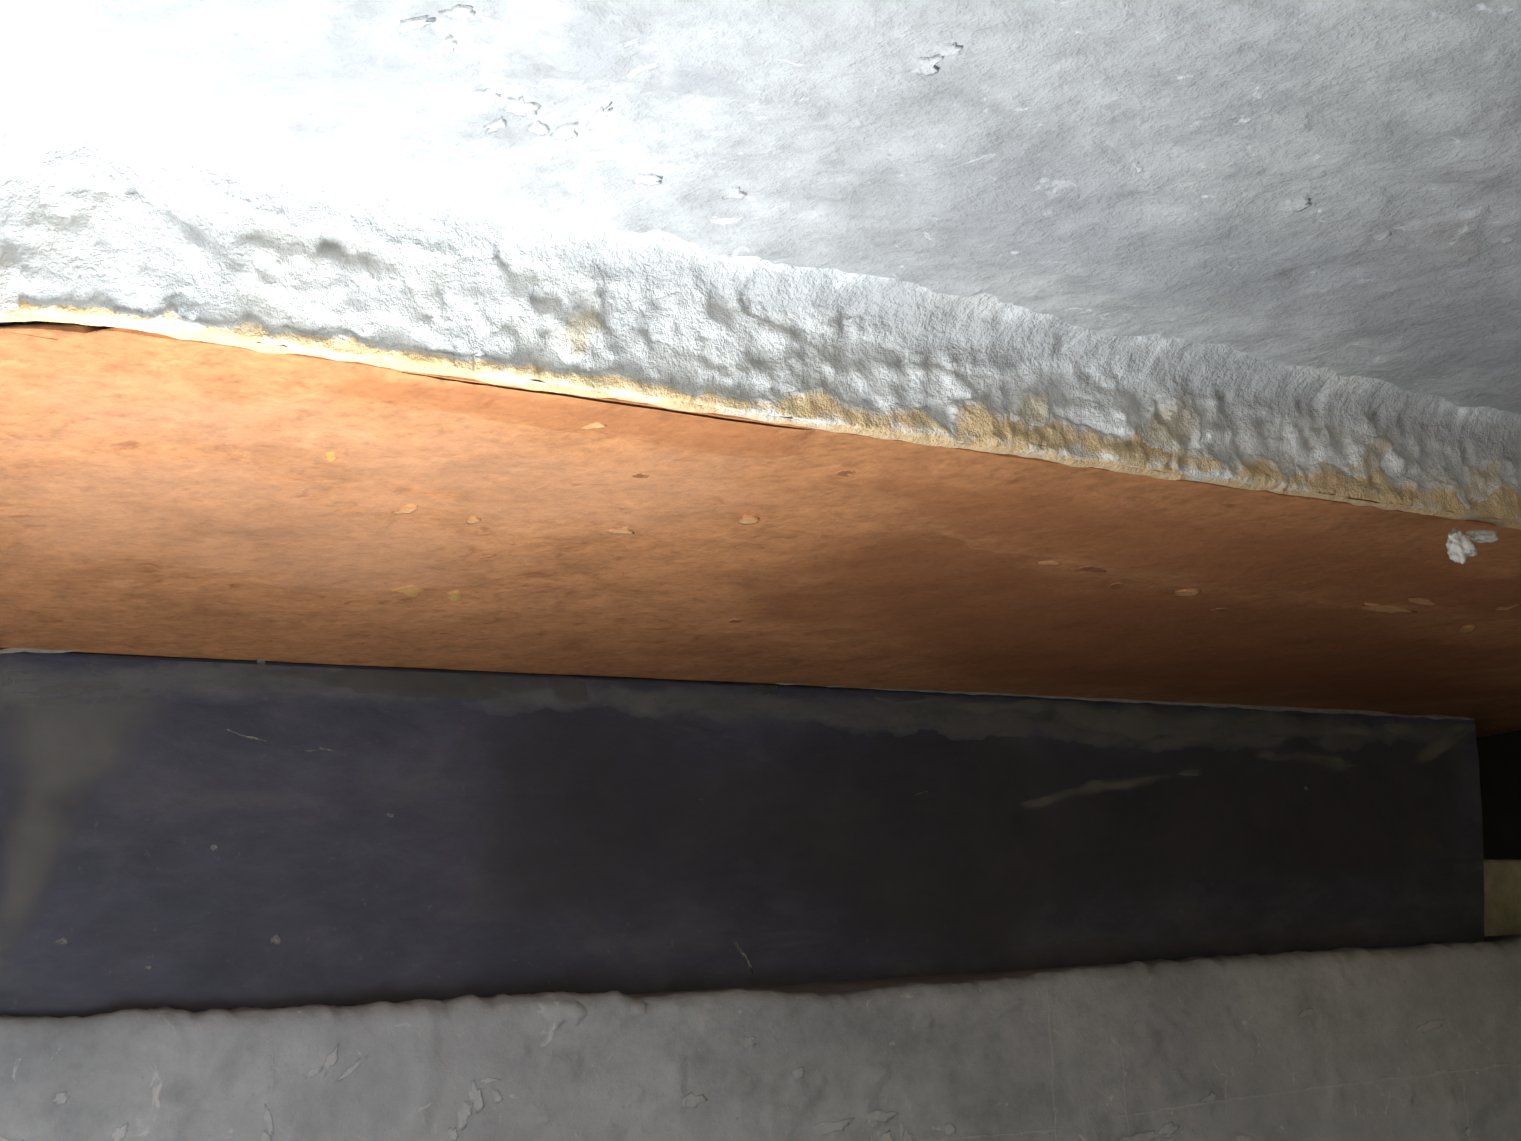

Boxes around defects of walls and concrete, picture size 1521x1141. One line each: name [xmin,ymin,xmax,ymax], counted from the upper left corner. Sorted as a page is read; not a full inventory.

efflorescence [56,192,231,312]
efflorescence [252,242,433,339]
efflorescence [434,256,563,340]
efflorescence [623,289,803,368]
water stain [889,121,1521,405]
water stain [0,331,833,601]
efflorescence [836,358,979,408]
efflorescence [1049,392,1149,437]
efflorescence [1264,426,1373,471]
efflorescence [1379,447,1421,477]
water stain [0,653,1476,916]